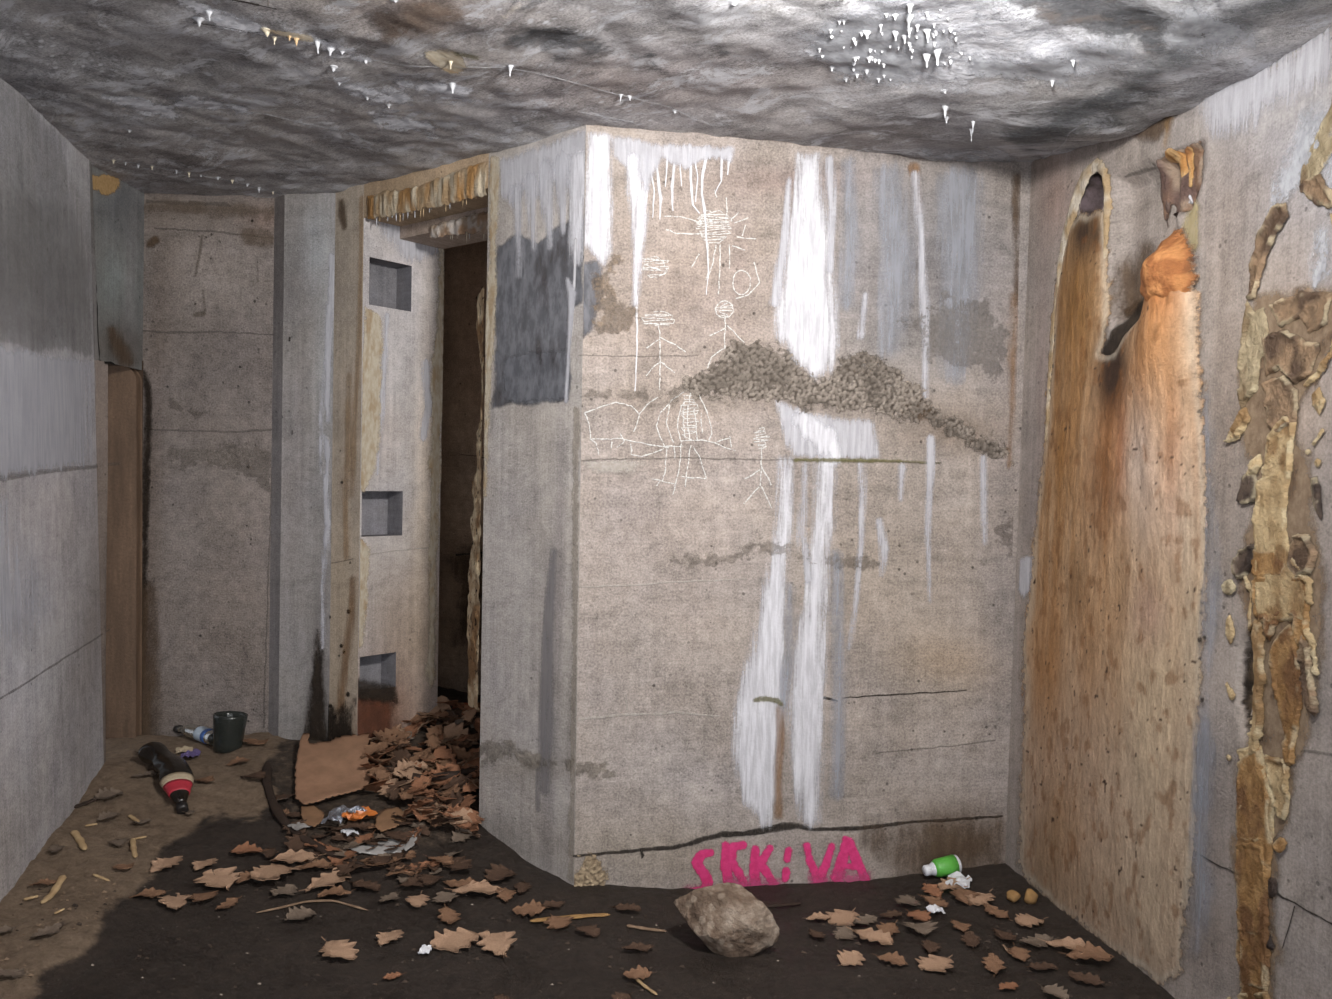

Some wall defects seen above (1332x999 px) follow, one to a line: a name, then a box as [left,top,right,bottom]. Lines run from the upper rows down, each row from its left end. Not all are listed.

damp [178,0,478,139]
damp [799,0,1136,94]
damp [1205,28,1331,135]
spalling [1156,141,1204,226]
peeling [1299,103,1332,223]
damp [772,153,840,377]
damp [367,132,733,710]
damp [733,403,888,828]
peeling [1221,202,1332,999]
crack [573,815,1003,859]
crack [1194,850,1234,873]
crack [1277,892,1332,949]